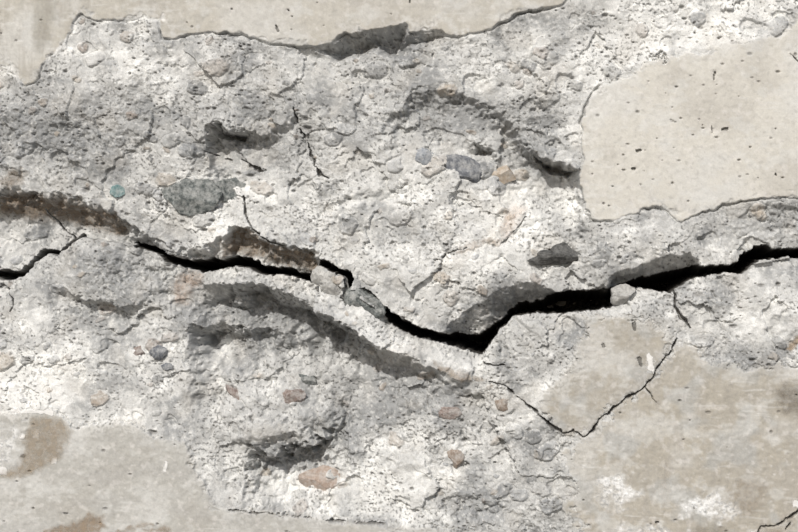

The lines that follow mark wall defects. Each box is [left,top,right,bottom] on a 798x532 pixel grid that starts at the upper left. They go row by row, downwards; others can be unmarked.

crack [0,210,87,313]
crack [242,195,284,246]
spalling [0,0,798,334]
spalling [0,243,798,532]
crack [134,241,798,438]
crack [757,509,798,532]